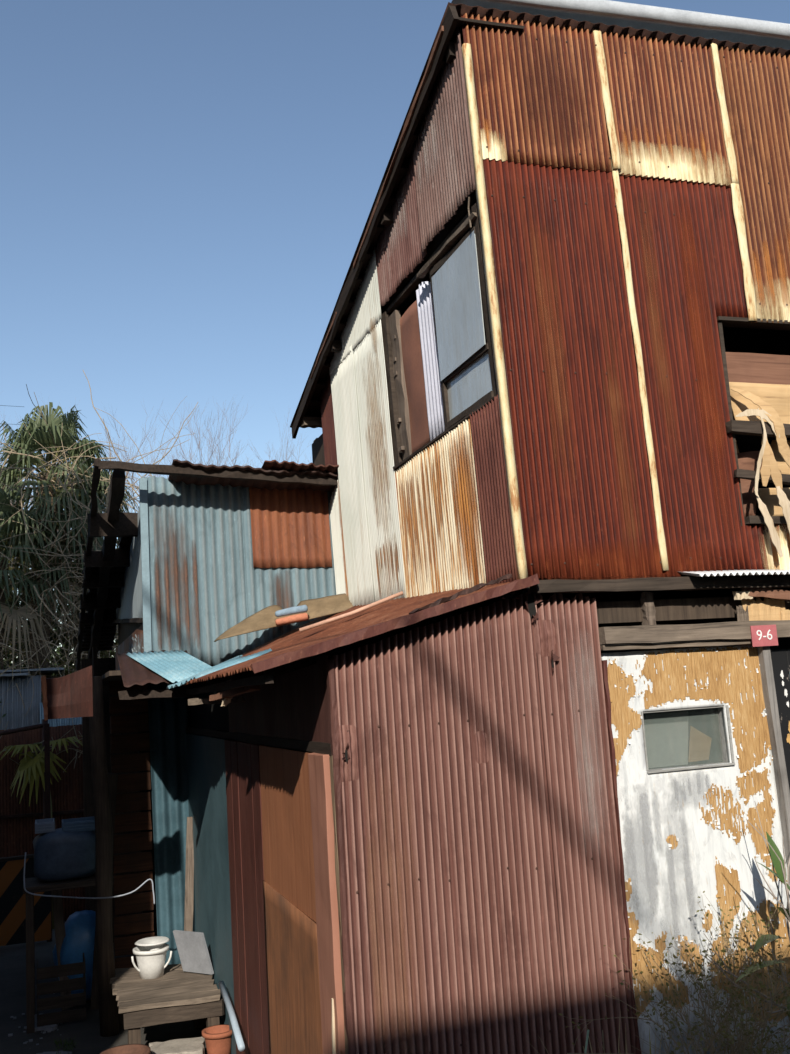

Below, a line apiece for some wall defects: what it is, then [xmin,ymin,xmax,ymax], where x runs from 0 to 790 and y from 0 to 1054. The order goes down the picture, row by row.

corrosion [690,291,722,457]
corrosion [375,446,481,595]
corrosion [579,548,683,579]
peeling [607,646,787,882]
peeling [625,856,790,1023]